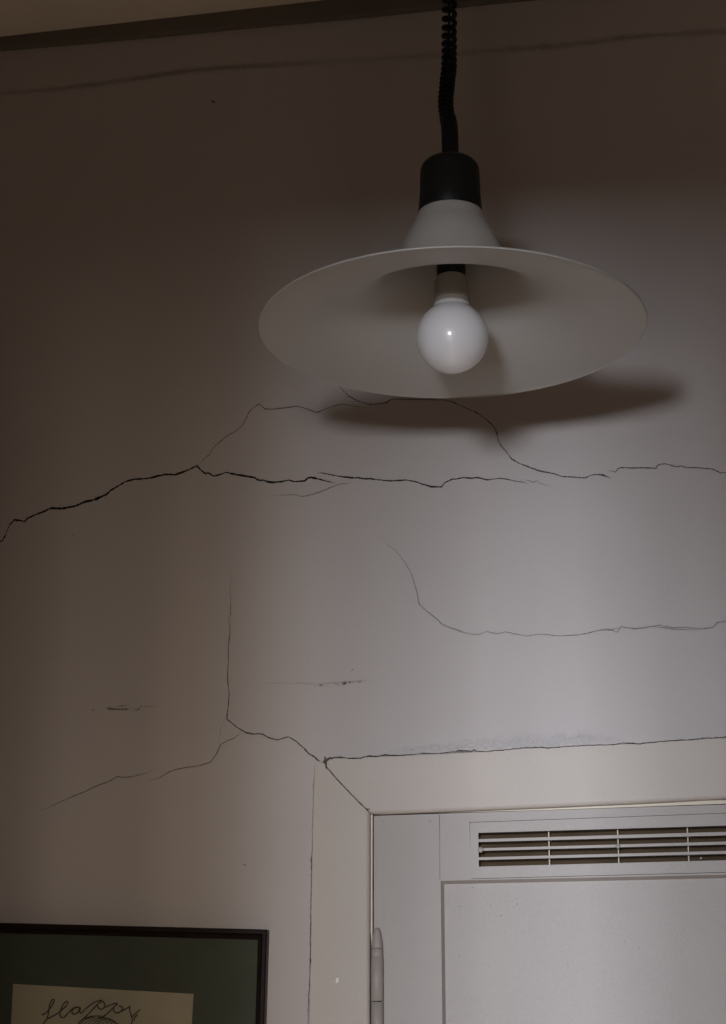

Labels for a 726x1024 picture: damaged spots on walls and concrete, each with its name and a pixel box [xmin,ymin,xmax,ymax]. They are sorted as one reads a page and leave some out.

crack [0,387,726,544]
crack [48,612,726,813]
crack [305,856,313,1018]